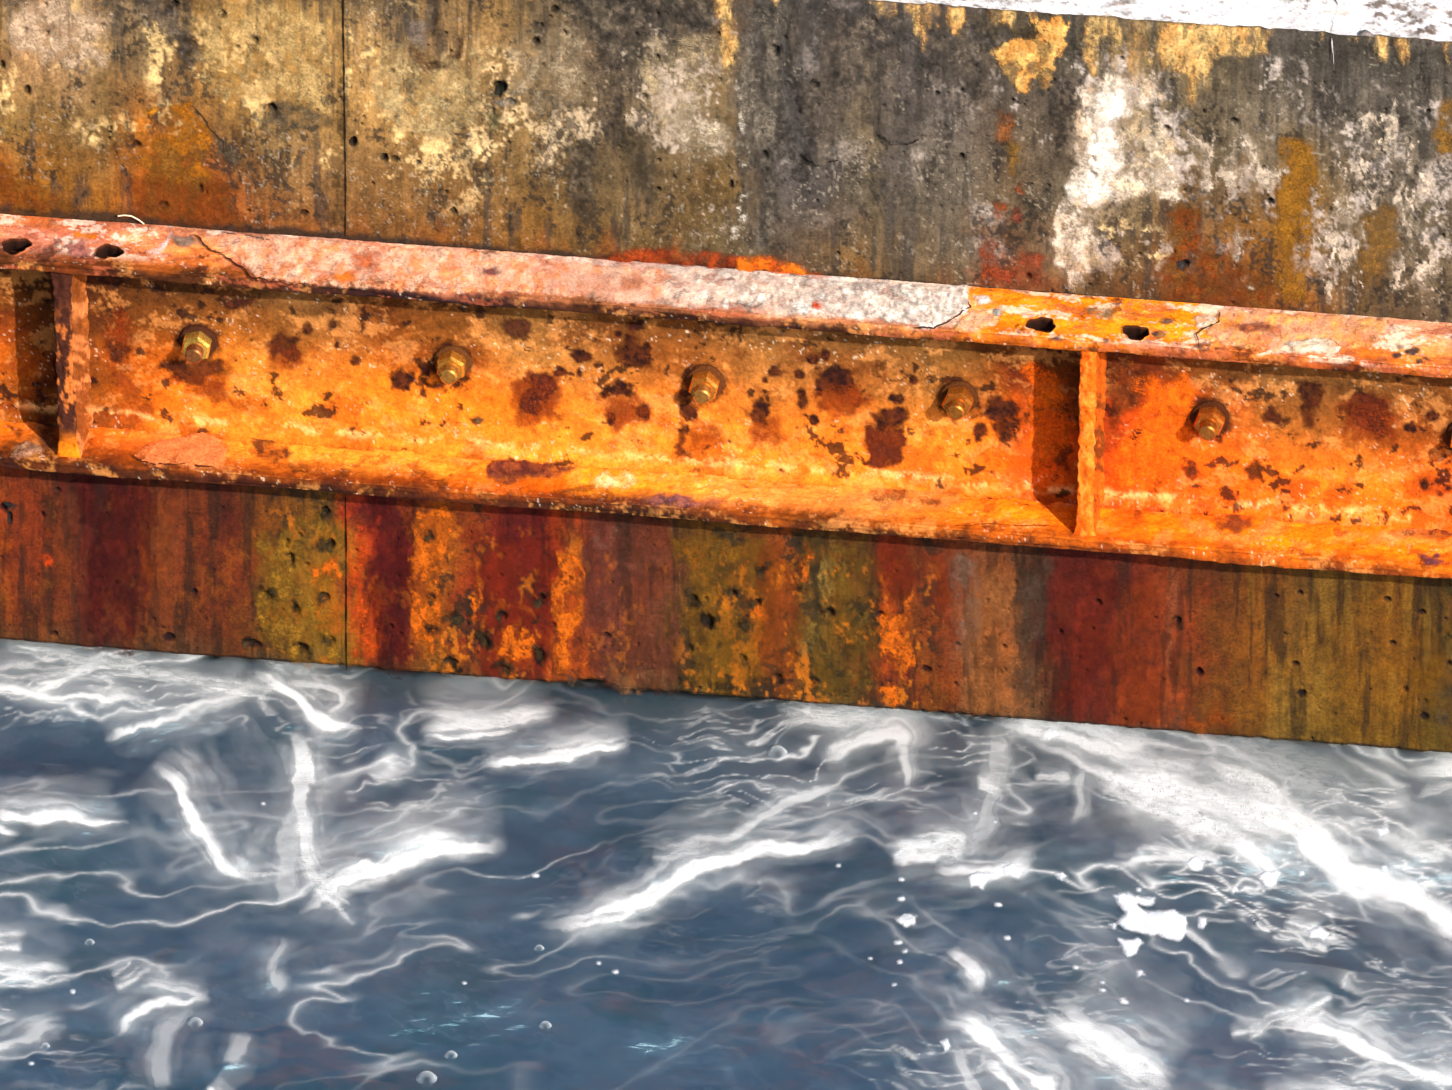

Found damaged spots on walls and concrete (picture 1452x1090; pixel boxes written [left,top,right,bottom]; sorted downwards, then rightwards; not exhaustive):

leakage [136,0,203,70]
leakage [1377,36,1409,59]
leakage [262,103,331,134]
leakage [563,0,786,249]
leakage [828,2,1268,284]
rust [134,100,1045,332]
rust [1160,137,1387,355]
rust [487,460,574,493]
rust [512,321,652,431]
rust [749,349,918,469]
rust [937,363,1076,482]
rust [408,505,585,676]